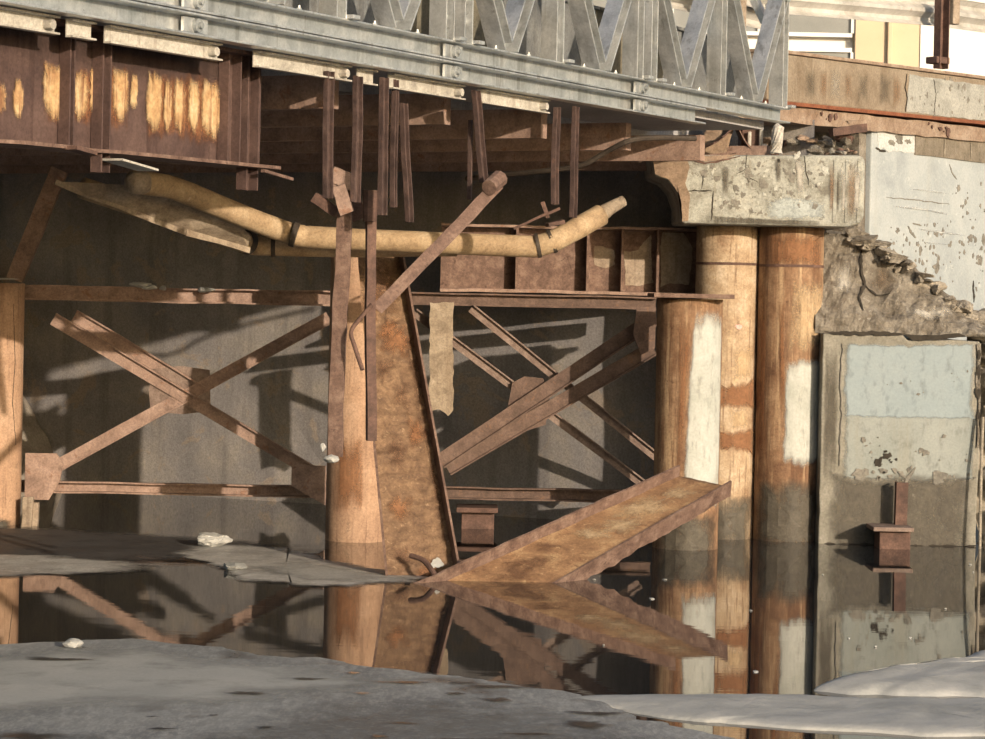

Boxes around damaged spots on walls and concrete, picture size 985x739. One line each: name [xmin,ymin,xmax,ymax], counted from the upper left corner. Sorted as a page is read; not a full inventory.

corrosion [157,80,208,140]
peeling [888,134,912,146]
crack [689,176,714,219]
peeling [888,185,985,292]
spalling [905,333,967,341]
spalling [967,343,981,448]
peeling [851,437,913,481]
peeling [915,448,956,485]
corrosion [580,489,690,538]
water stain [832,475,966,546]